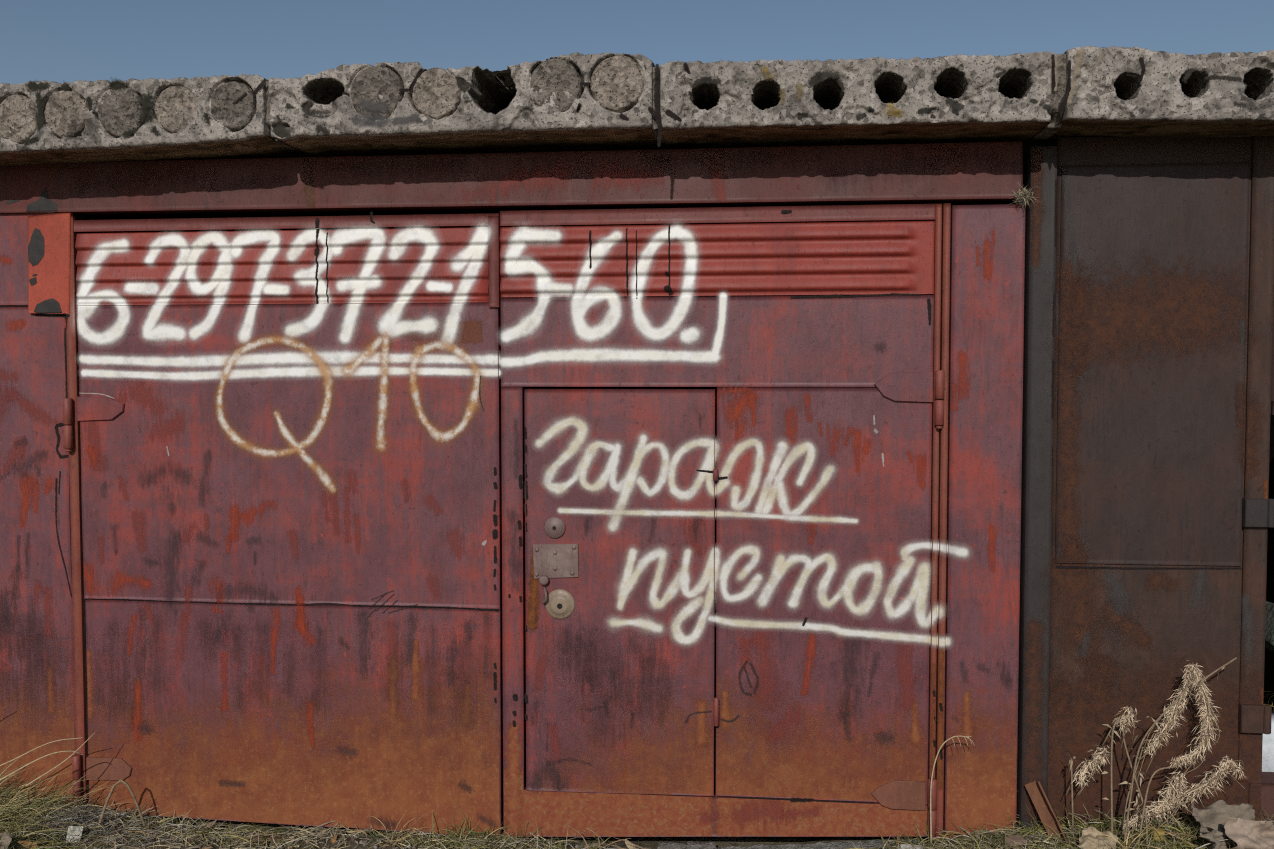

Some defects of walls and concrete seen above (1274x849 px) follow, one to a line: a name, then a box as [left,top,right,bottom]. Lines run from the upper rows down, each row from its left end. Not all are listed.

spalling [456,78,471,92]
spalling [809,71,845,90]
spalling [1184,67,1242,82]
spalling [945,98,964,116]
spalling [269,103,331,138]
rust [528,549,539,630]